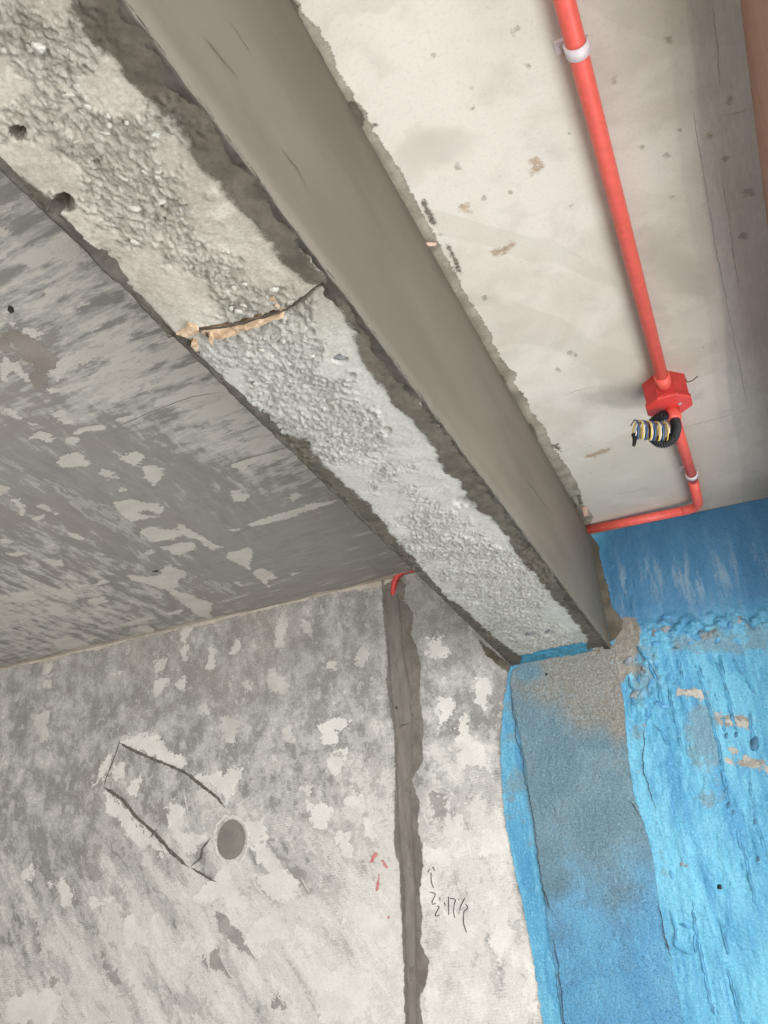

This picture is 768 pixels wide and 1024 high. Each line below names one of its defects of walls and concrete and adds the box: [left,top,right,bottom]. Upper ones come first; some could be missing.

crack [199,286,316,338]
crack [104,741,225,882]